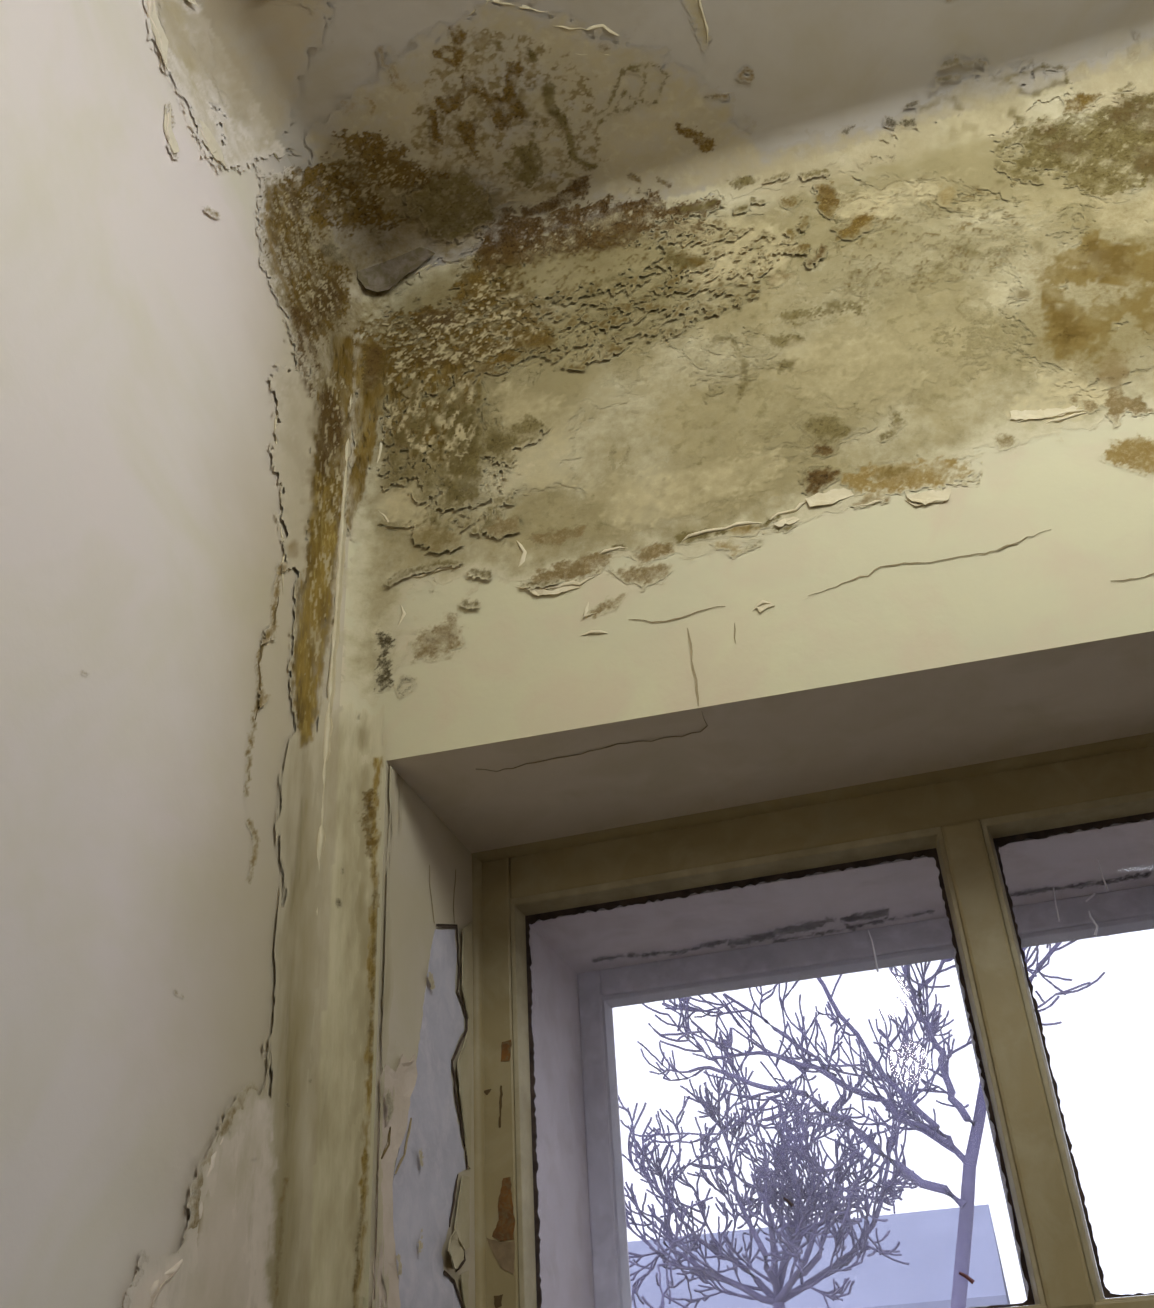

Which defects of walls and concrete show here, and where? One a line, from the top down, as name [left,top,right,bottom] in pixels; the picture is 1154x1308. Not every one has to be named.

peeling [143,0,334,174]
peeling [1010,406,1086,424]
crack [242,361,323,885]
peeling [385,519,494,588]
crack [478,606,736,772]
damp [252,0,1154,1308]
peeling [479,488,951,636]
crack [809,529,1051,596]
peeling [120,1081,283,1308]
spalling [372,921,503,1308]